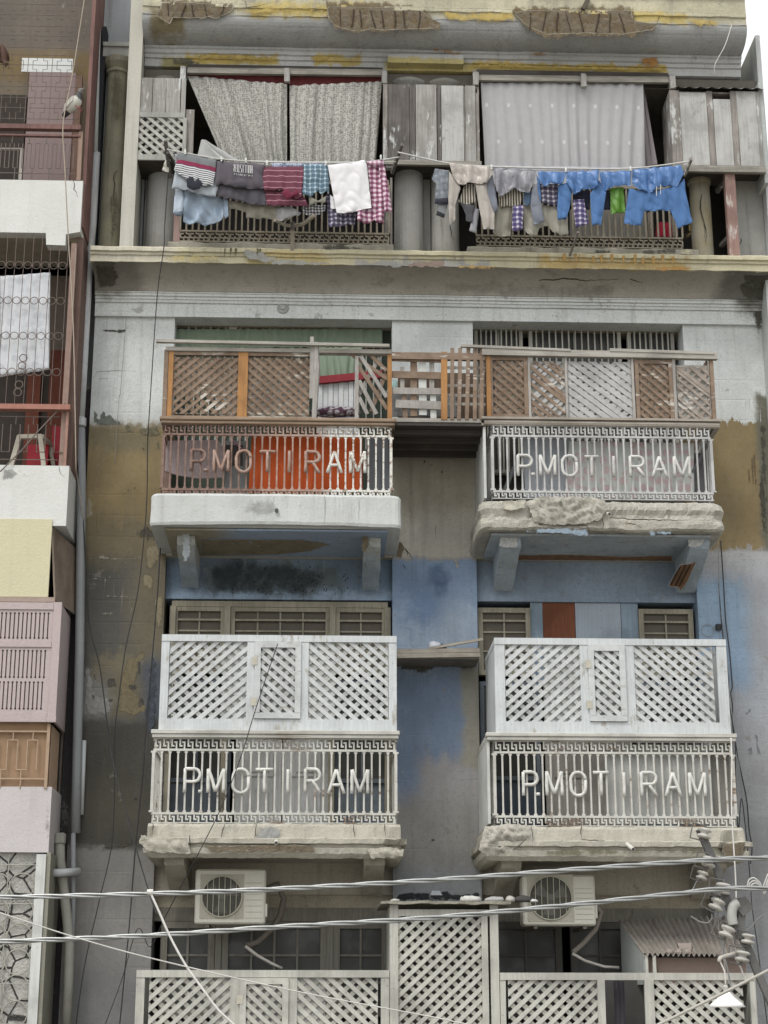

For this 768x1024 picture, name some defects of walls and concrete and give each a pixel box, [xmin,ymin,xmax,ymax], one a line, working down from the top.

spalling [156,0,233,25]
spalling [326,0,441,33]
spalling [512,4,658,39]
crack [539,276,642,284]
peeling [94,411,160,450]
peeling [143,546,163,628]
leakage [205,561,361,595]
peeling [84,652,146,716]
spalling [139,835,191,854]
spalling [205,844,314,853]
spalling [368,847,403,859]
spalling [723,842,744,856]